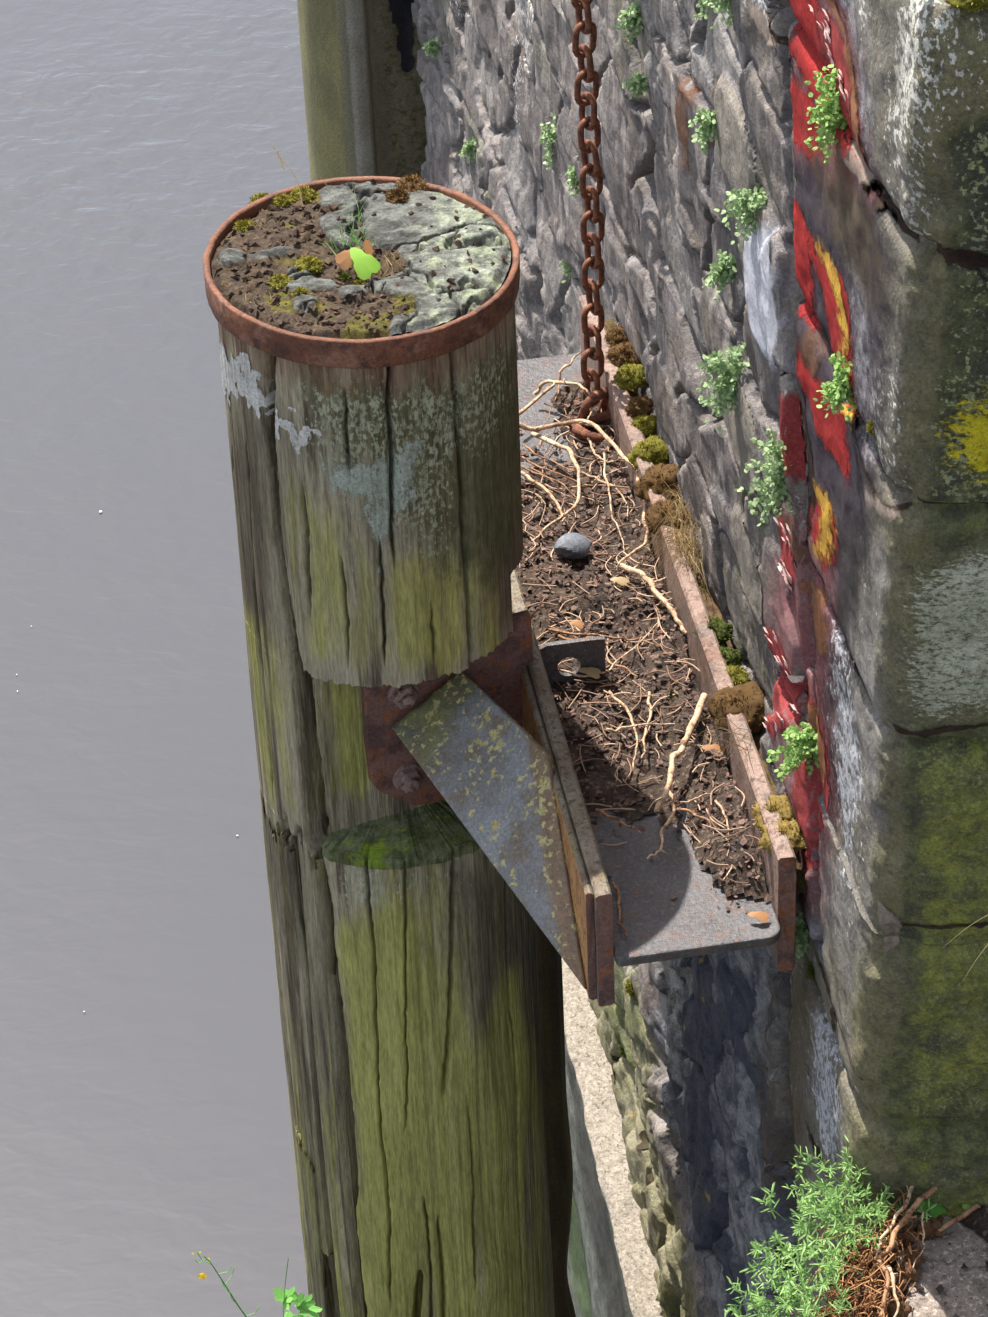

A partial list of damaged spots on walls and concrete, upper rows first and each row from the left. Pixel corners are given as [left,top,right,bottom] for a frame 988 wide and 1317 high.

crack [900,921,988,929]